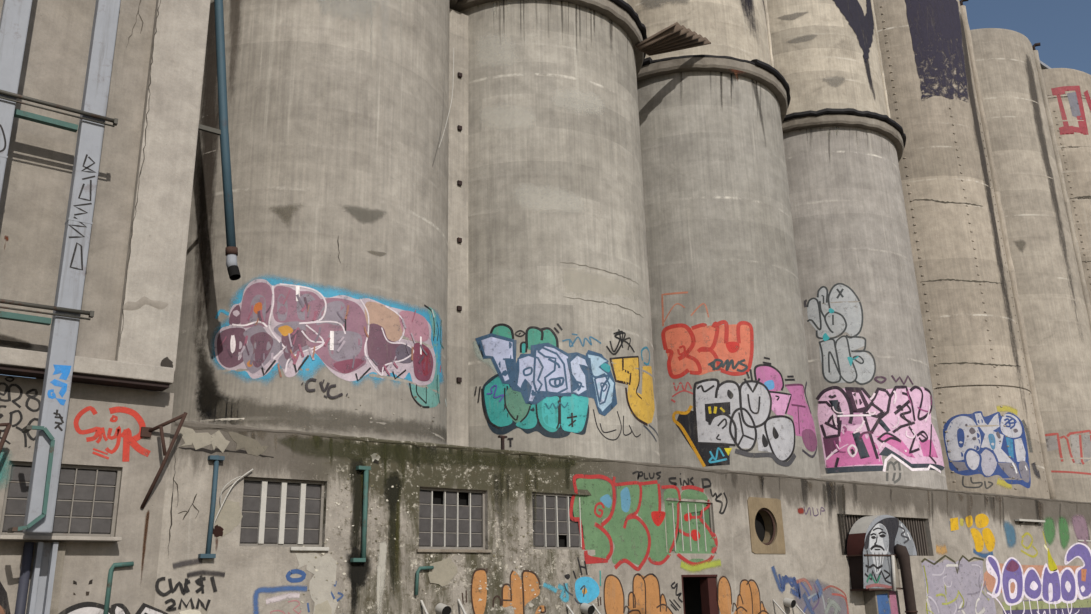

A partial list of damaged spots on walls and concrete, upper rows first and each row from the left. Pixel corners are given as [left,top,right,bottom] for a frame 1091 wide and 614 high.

crack [119,0,161,347]
spalling [179,427,274,458]
water stain [195,341,478,612]